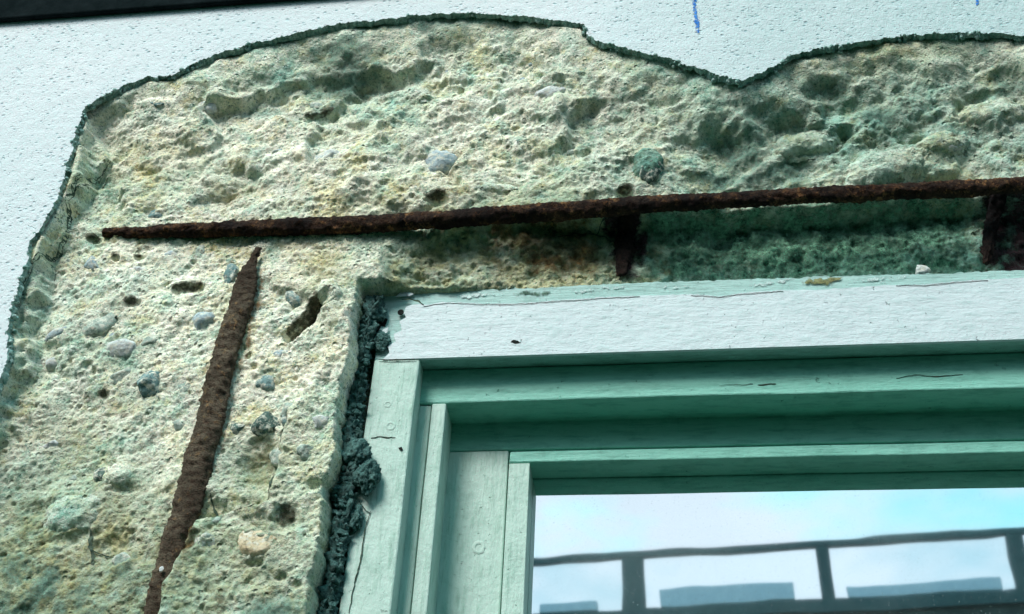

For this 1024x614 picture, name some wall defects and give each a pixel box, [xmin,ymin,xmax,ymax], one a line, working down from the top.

spalling [0,11,1024,398]
rust [979,193,1024,271]
spalling [361,345,376,438]
spalling [230,421,245,435]
spalling [251,411,280,437]
spalling [312,415,329,429]
spalling [269,448,282,468]
spalling [296,444,314,461]
spalling [93,467,106,482]
spalling [238,530,277,557]
spalling [111,552,131,566]